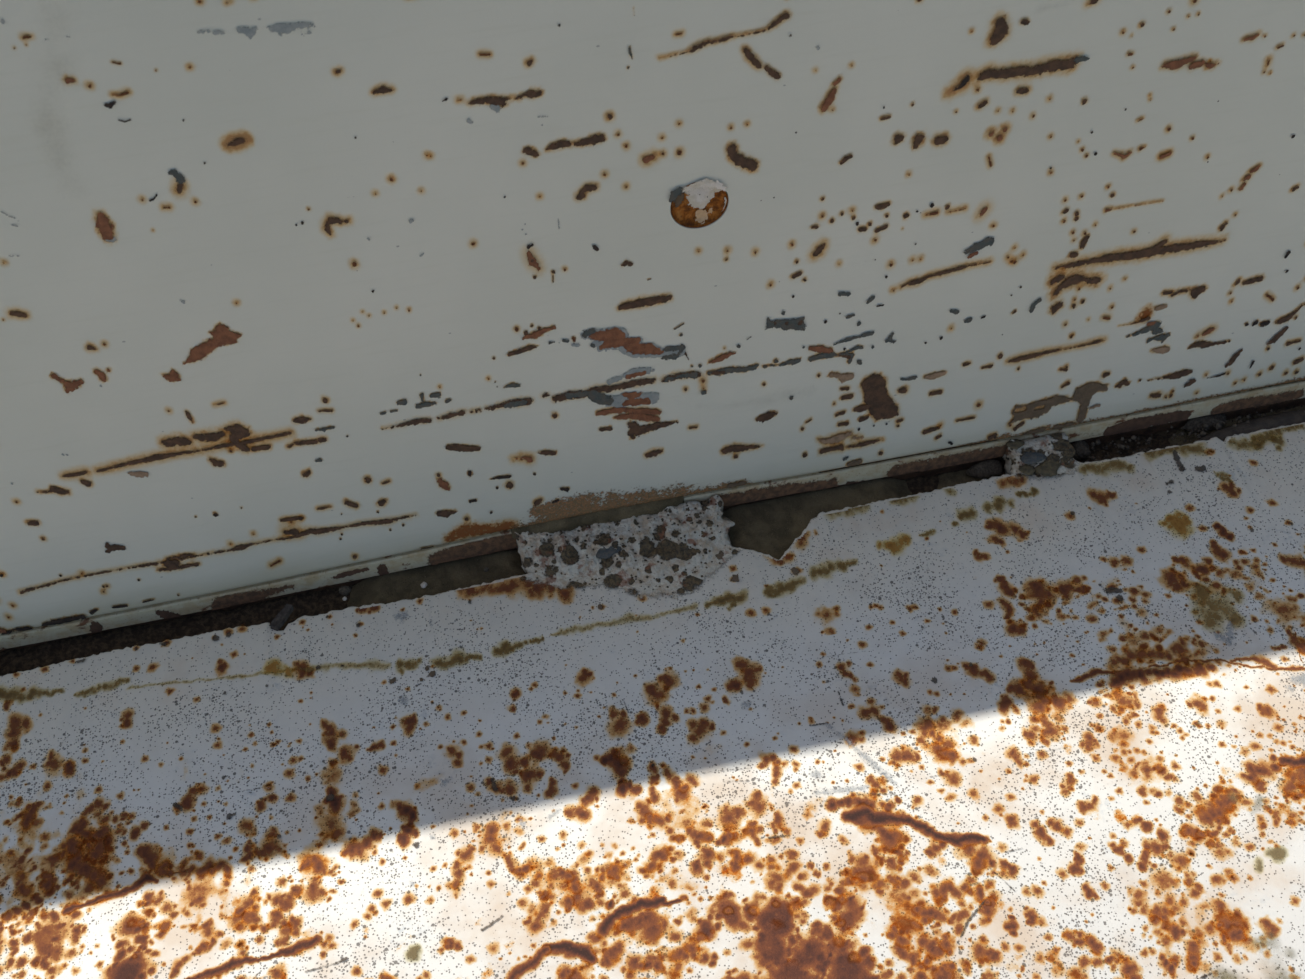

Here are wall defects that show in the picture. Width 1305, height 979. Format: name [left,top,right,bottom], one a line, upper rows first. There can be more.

rust [527,251,540,271]
peeling [779,244,825,282]
peeling [964,237,994,259]
spalling [1011,222,1228,314]
peeling [380,286,1305,506]
peeling [436,499,477,521]
rust [878,476,1038,560]
rust [1089,490,1116,508]
rust [1214,472,1241,497]
rust [217,653,245,678]
rust [265,626,588,690]
rust [0,665,434,979]